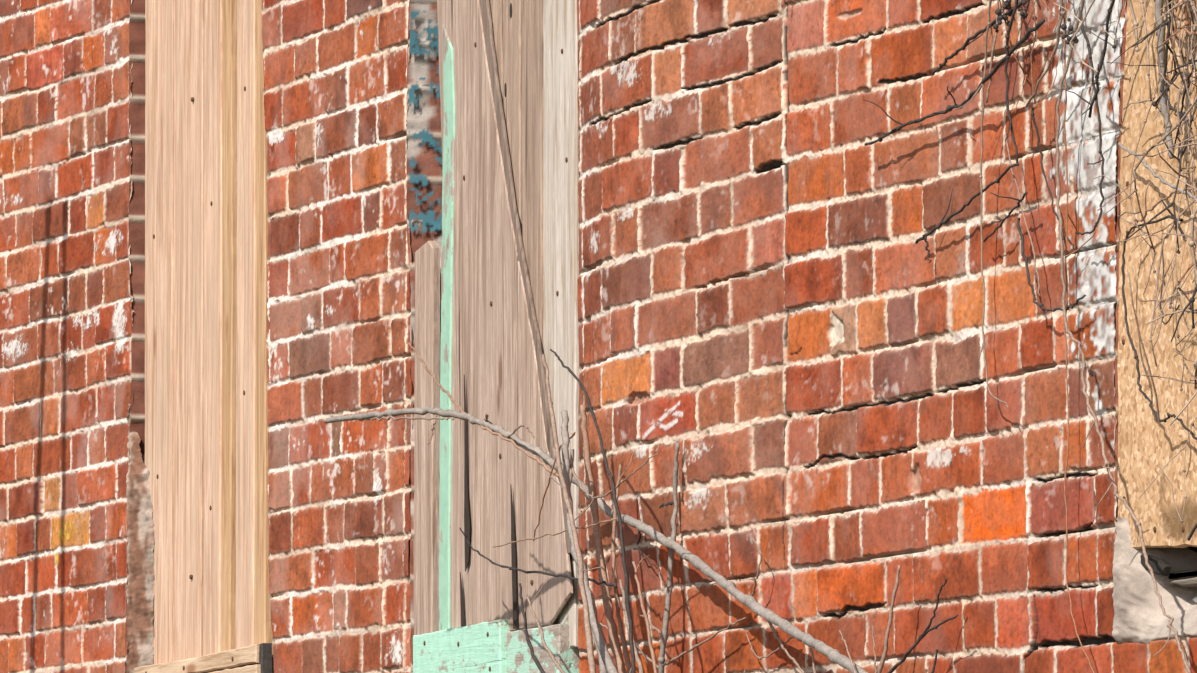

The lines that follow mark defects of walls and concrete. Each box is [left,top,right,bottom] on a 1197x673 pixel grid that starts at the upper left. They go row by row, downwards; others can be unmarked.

crack [783,0,791,213]
peeling [1048,0,1125,362]
crack [784,310,798,355]
peeling [1092,392,1109,416]
crack [783,447,917,560]